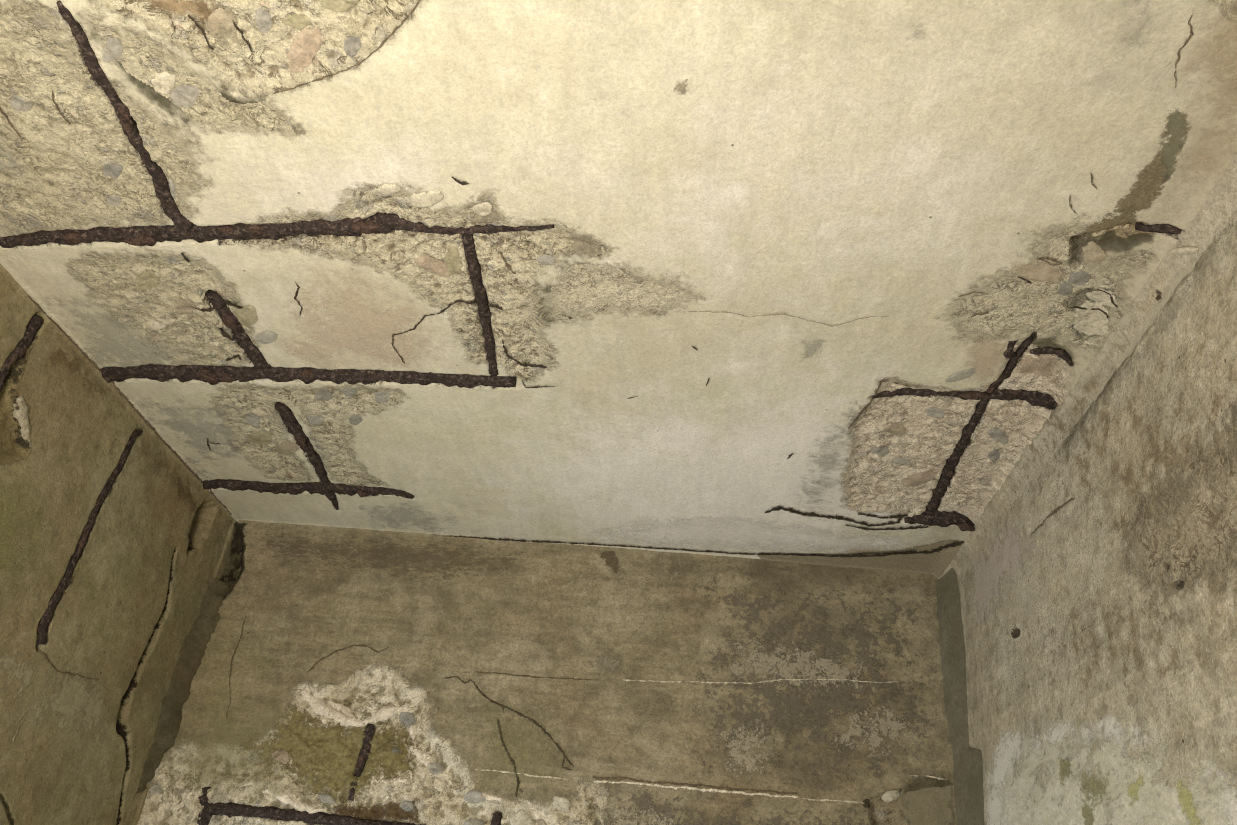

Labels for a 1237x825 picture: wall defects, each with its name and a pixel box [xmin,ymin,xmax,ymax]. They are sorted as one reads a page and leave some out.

crack [28,296,232,515]
spalling [0,0,705,510]
spalling [841,221,1185,531]
damp [1069,109,1191,243]
damp [1063,152,1237,442]
crack [0,793,14,825]
crack [41,536,196,825]
crack [443,676,572,797]
spalling [137,662,909,825]
peeling [693,575,932,785]